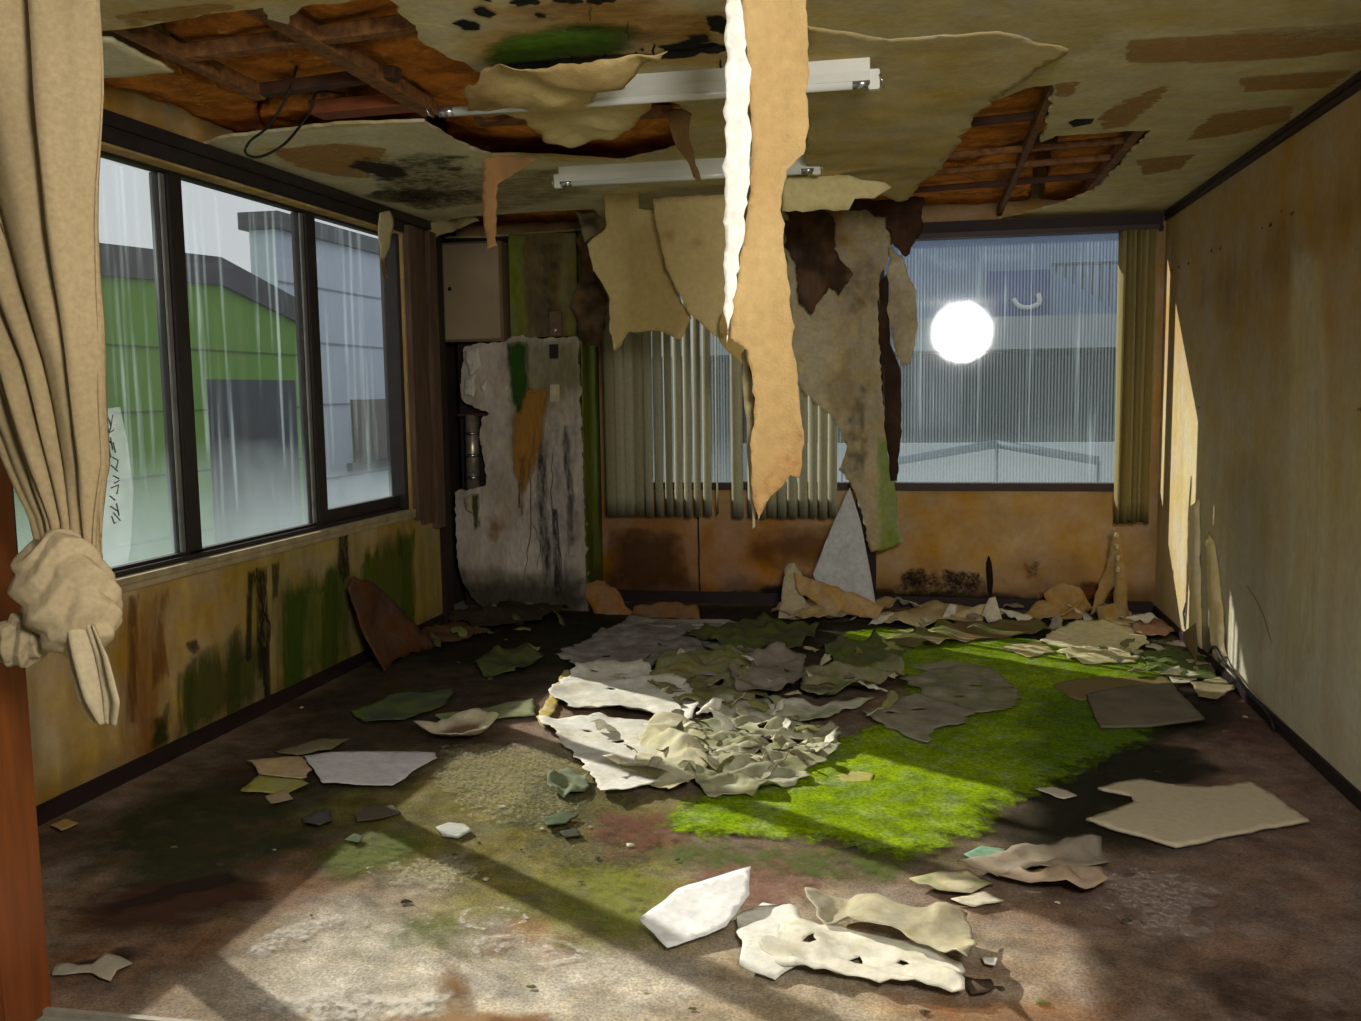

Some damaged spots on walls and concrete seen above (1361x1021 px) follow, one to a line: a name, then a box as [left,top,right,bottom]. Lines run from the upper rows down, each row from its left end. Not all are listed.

leakage [452,0,497,31]
leakage [509,0,727,68]
peeling [1098,86,1168,129]
leakage [347,155,480,210]
peeling [784,209,853,315]
spalling [464,348,487,398]
leakage [183,532,415,734]
leakage [129,598,168,749]